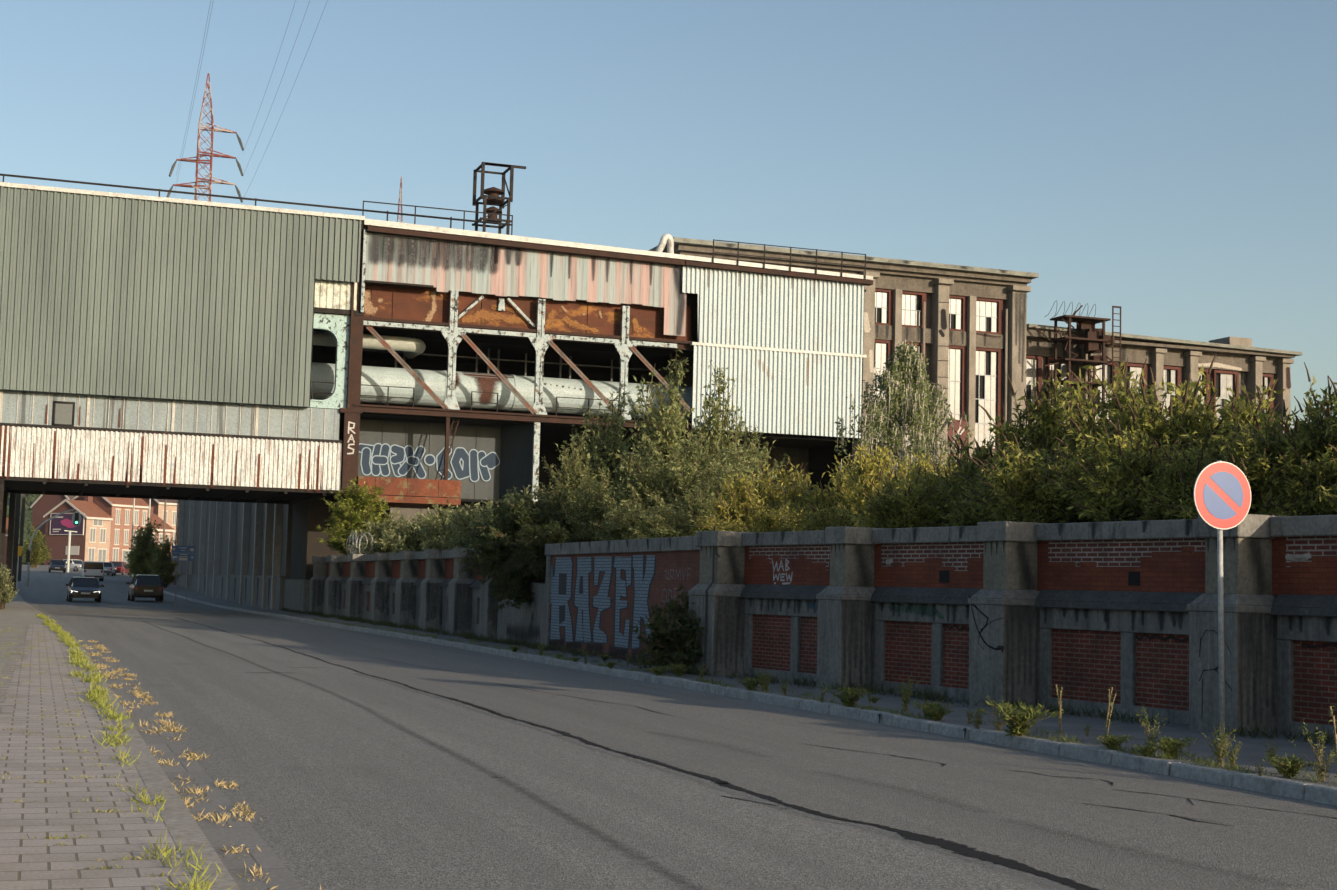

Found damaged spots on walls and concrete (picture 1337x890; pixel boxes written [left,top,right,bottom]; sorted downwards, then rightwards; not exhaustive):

peeling [462,305,527,326]
peeling [545,306,602,333]
rust [0,426,11,478]
rust [31,405,144,484]
rust [162,445,176,485]
rust [282,445,322,491]